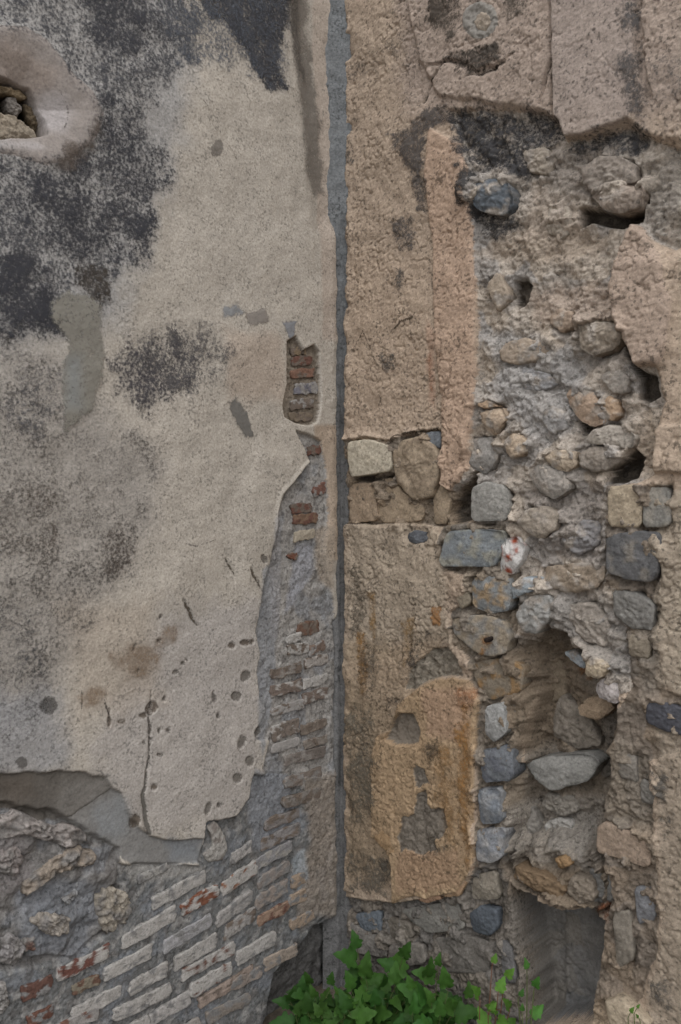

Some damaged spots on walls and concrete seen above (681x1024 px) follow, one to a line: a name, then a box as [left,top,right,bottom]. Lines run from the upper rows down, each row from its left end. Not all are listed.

spalling [0,26,104,165]
leakage [0,0,322,349]
leakage [387,47,681,251]
leakage [621,2,642,35]
leakage [106,321,238,416]
spalling [343,109,681,1024]
crack [141,702,152,835]
spalling [0,336,338,1024]